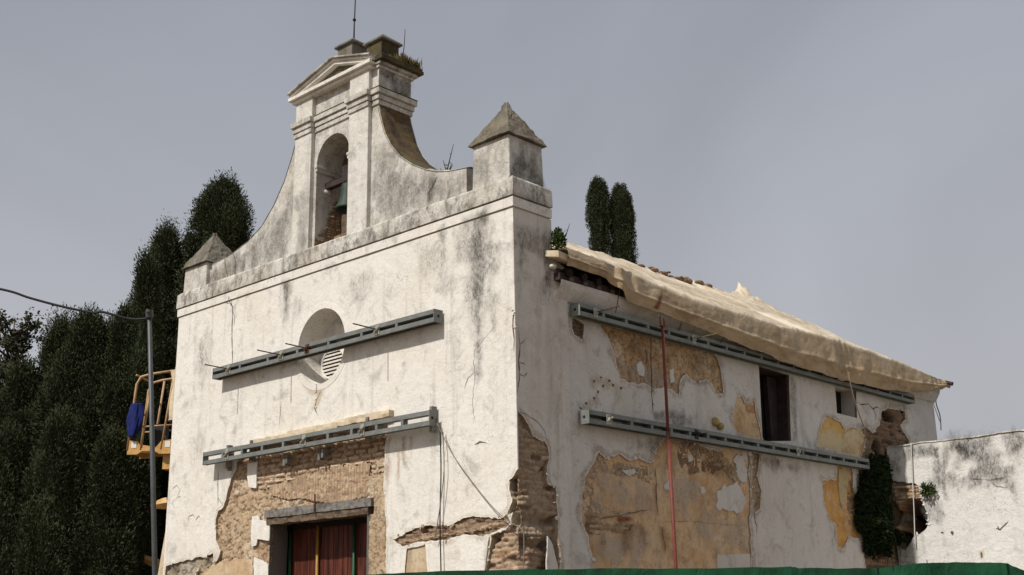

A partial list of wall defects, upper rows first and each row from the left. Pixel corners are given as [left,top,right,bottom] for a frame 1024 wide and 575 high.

water stain [464,212,494,316]
spalling [164,413,563,575]
crack [464,309,527,444]
spalling [580,324,726,409]
spalling [577,432,762,569]
spalling [732,394,764,440]
spalling [817,405,931,569]
water stain [908,434,1012,495]